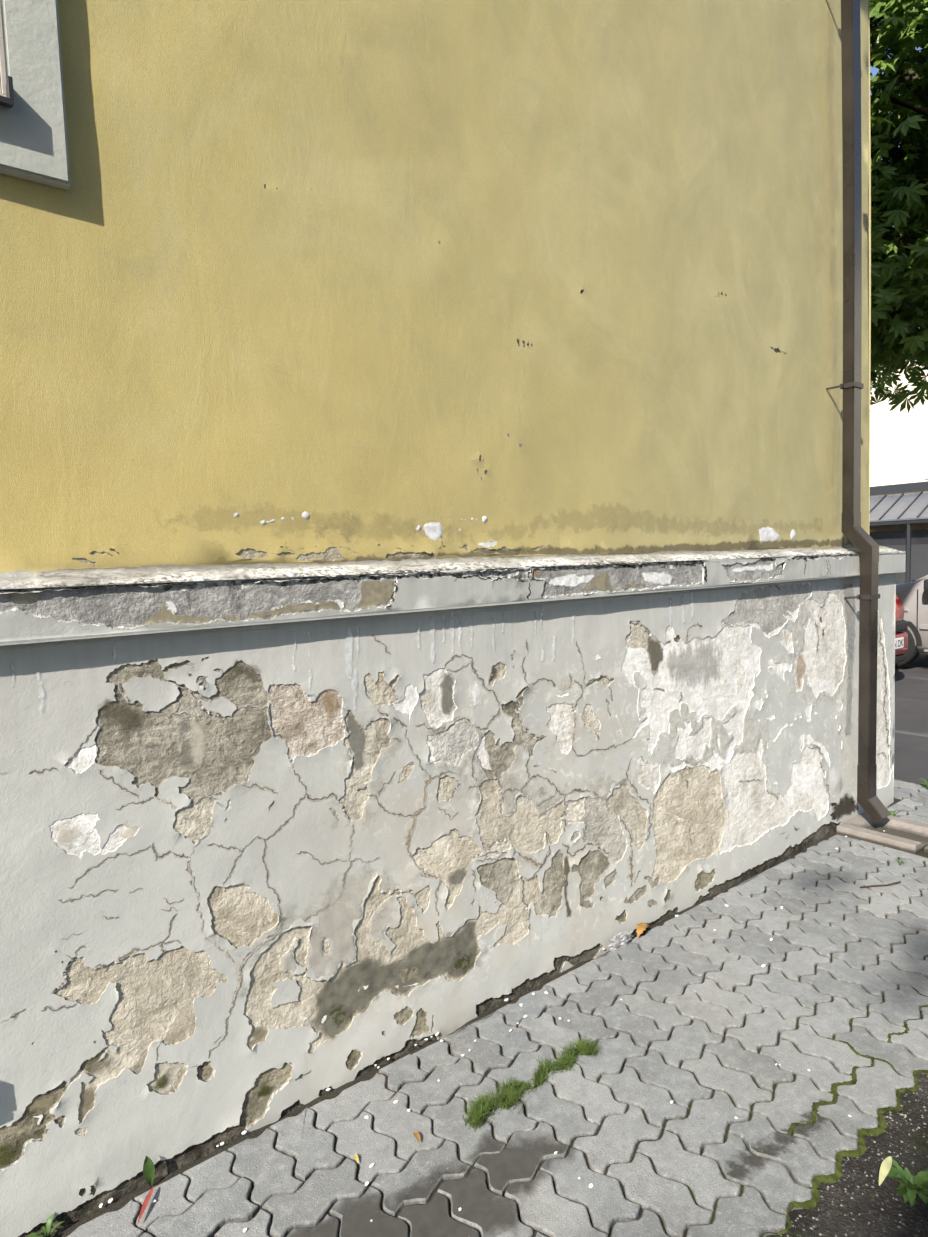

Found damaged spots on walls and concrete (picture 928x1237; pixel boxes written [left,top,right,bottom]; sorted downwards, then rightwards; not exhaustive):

flaking render [0,540,707,629]
crack [521,639,586,690]
leakage [341,538,853,562]
peeling [49,813,142,860]
flaking render [64,657,399,856]
crack [0,654,653,1058]
flaking render [207,553,858,1078]
flaking render [0,946,227,1172]
flaking render [18,1062,311,1237]